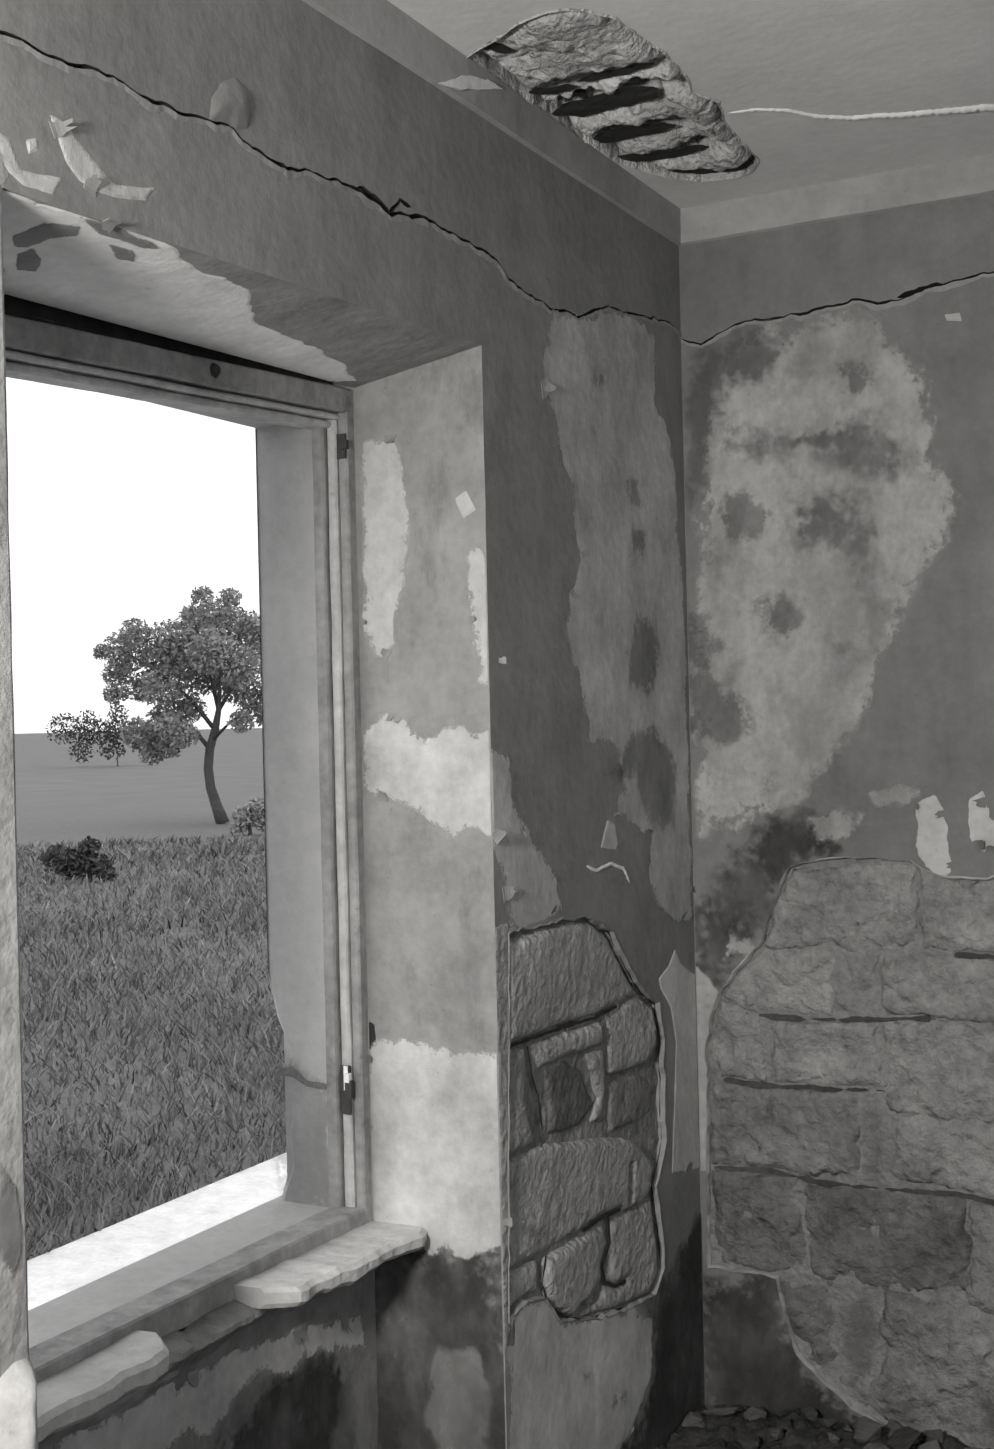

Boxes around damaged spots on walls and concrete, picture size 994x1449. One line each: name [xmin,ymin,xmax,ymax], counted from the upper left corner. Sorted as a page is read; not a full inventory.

crack [0,30,994,349]
spalling [436,8,759,182]
peeling [361,434,409,660]
peeling [455,491,476,518]
peeling [467,547,507,685]
peeling [541,310,692,922]
damp [690,310,955,882]
peeling [0,115,356,1378]
damp [699,899,750,957]
spalling [363,711,994,1449]
peeling [57,1314,365,1449]
damp [235,1354,353,1449]